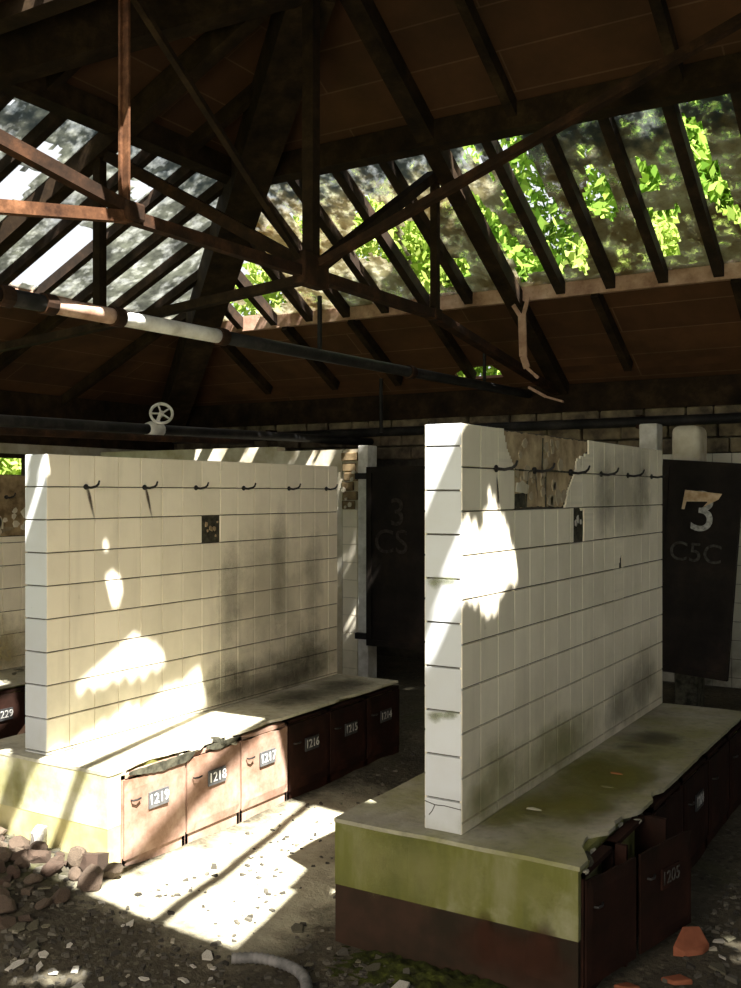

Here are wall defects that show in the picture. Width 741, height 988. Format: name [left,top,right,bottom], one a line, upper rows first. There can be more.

spalling [504,431,587,508]
spalling [0,475,27,536]
peeling [574,509,583,540]